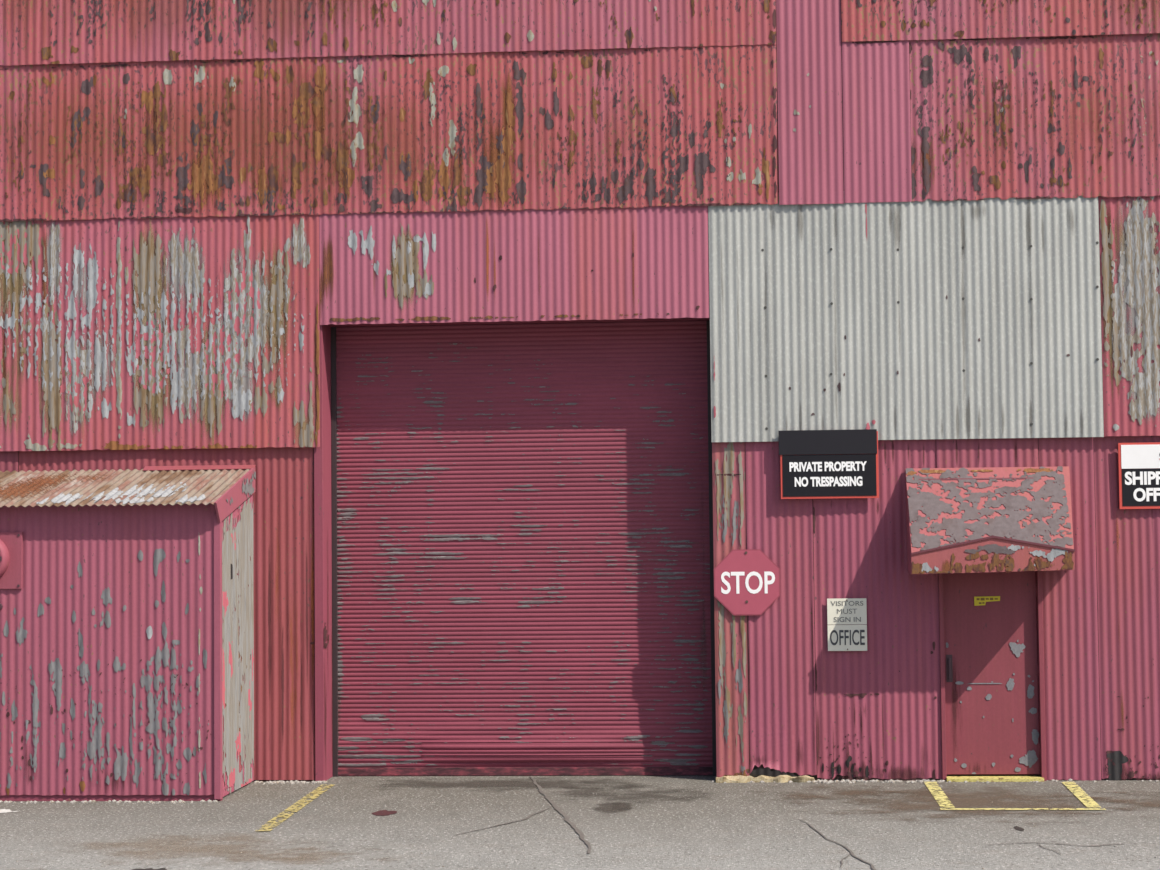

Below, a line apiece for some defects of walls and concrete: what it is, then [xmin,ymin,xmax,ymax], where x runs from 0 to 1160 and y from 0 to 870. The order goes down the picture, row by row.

peeling [0,0,770,451]
peeling [1100,196,1160,427]
rust [0,474,106,499]
peeling [906,466,1074,574]
peeling [0,472,256,795]
peeling [956,673,1037,714]
peeling [1009,640,1026,657]
peeling [1010,729,1039,772]